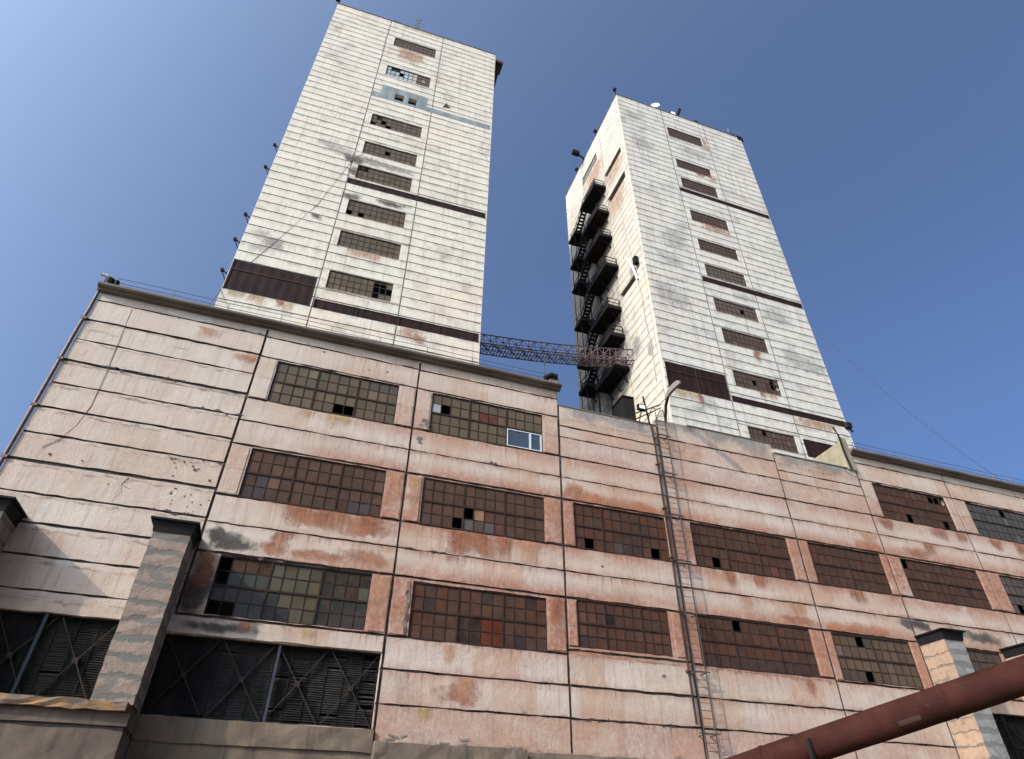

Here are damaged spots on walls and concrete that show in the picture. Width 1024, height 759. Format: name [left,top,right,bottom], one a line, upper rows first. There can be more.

rust [587,160,624,213]
rust [288,505,388,536]
rust [261,532,337,560]
rust [448,677,473,705]